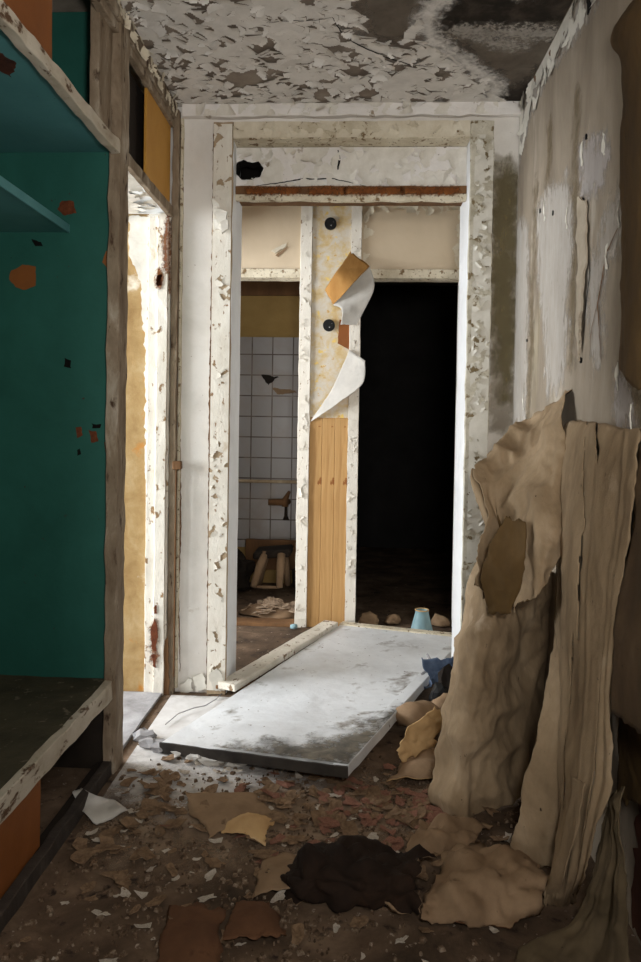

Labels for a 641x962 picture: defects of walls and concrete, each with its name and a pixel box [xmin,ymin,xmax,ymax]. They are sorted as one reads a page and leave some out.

peeling [517,0,599,173]
peeling [117,0,507,693]
peeling [513,132,611,424]
peeling [586,190,622,369]
peeling [614,362,635,429]
rust [149,605,159,668]
peeling [631,804,641,941]